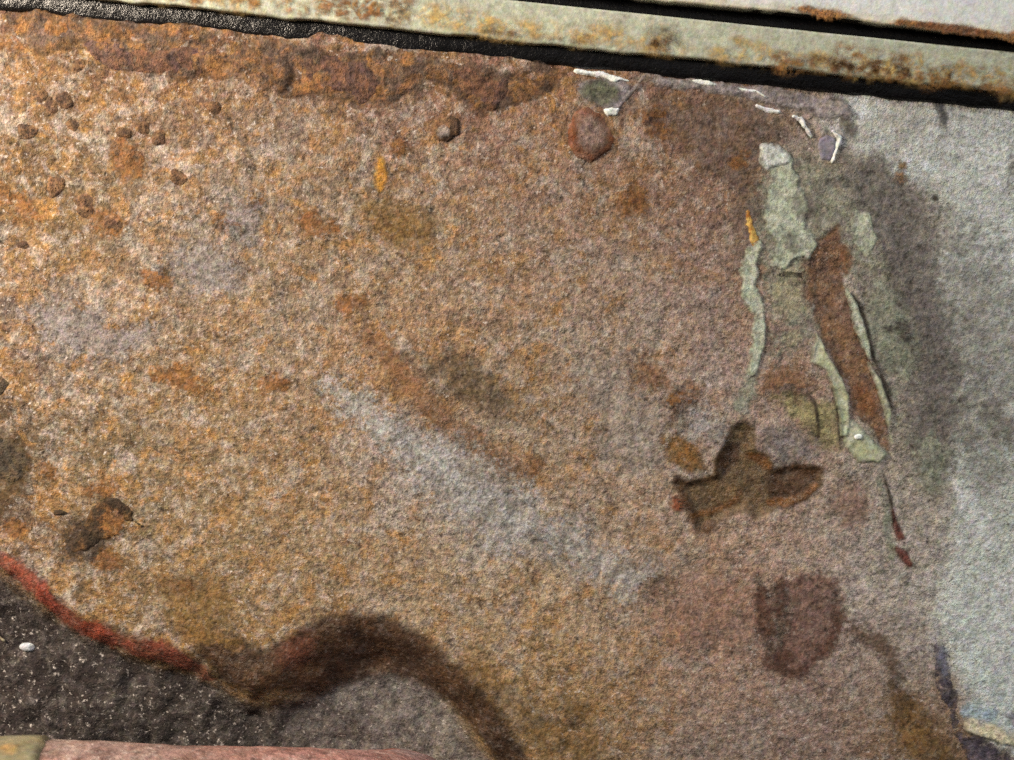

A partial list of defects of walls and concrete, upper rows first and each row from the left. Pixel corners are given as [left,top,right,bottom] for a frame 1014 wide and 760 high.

corrosion [277,0,413,24]
corrosion [17,124,39,140]
corrosion [36,88,79,131]
corrosion [109,121,166,184]
corrosion [0,9,571,117]
corrosion [735,38,1014,93]
peeling [574,69,930,534]
corrosion [0,430,32,539]
corrosion [53,481,144,571]
leakage [562,351,725,475]
leakage [757,425,820,467]
leakage [173,612,527,760]